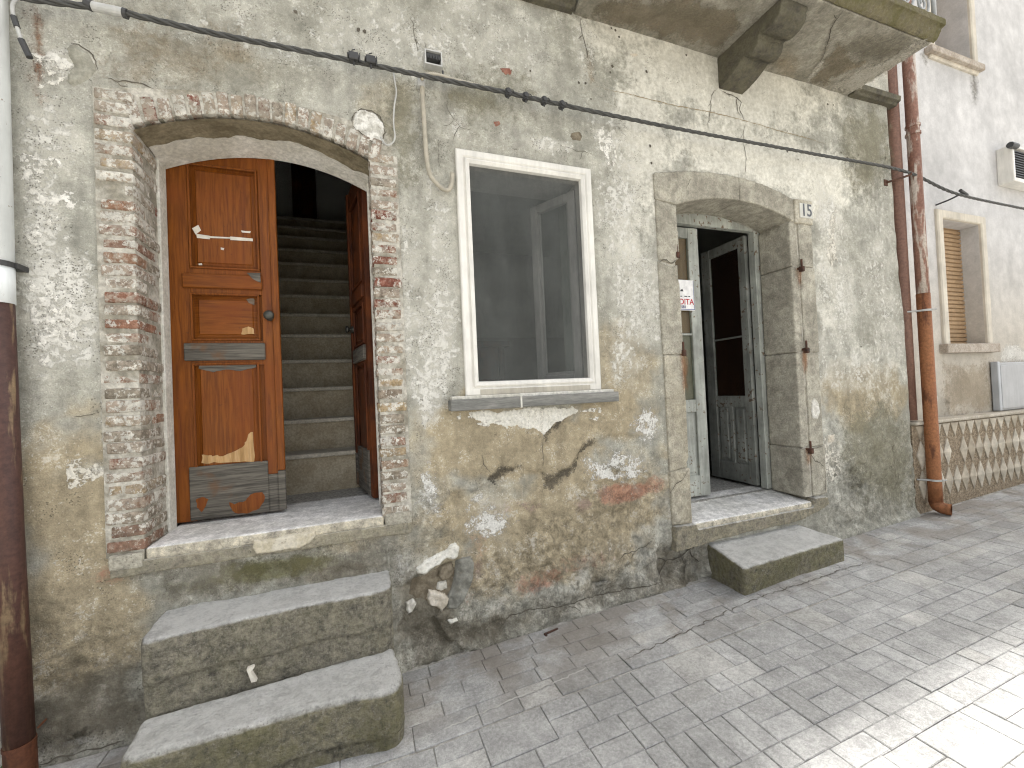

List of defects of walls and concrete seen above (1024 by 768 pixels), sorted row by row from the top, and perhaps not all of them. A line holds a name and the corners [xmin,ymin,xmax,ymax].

peeling [30,51,73,88]
crack [593,85,826,176]
peeling [19,153,77,246]
peeling [457,406,601,435]
peeling [66,459,104,489]
flaking render [405,542,474,624]
crack [484,542,699,627]